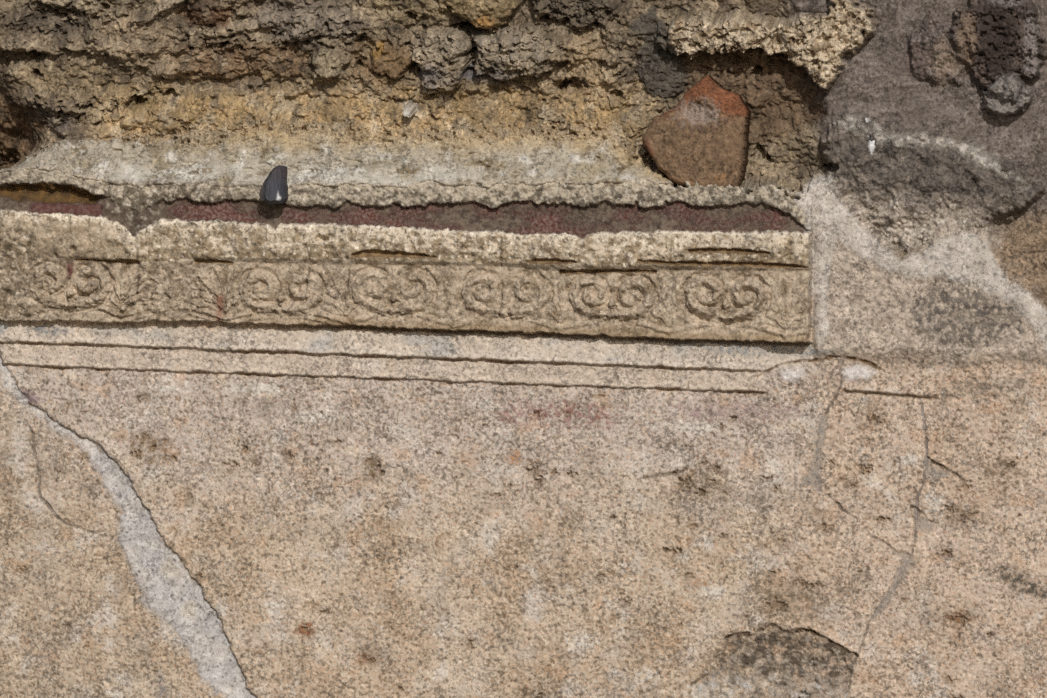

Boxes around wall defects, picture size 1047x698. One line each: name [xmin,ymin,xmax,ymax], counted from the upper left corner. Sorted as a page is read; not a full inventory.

peeling [31,202,103,216]
peeling [168,165,288,224]
peeling [508,201,644,237]
peeling [658,201,786,231]
crack [767,356,965,635]
crack [0,359,257,698]
spalling [691,628,859,698]